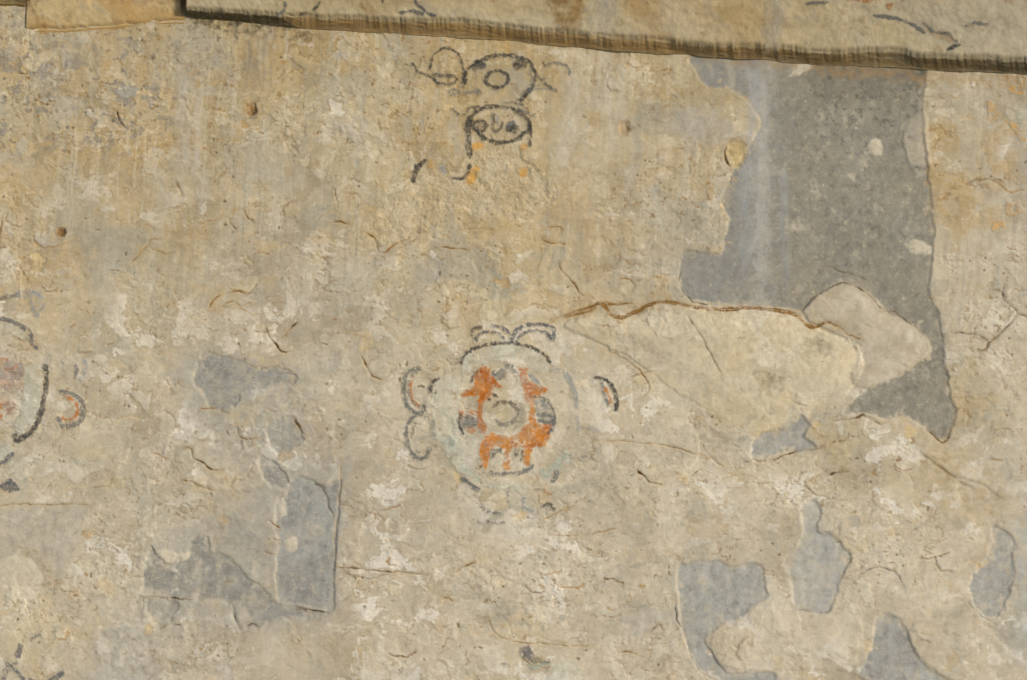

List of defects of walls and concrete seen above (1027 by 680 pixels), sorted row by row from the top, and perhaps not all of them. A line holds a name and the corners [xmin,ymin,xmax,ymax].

peeling [186,347,299,409]
crack [534,221,1027,402]
peeling [675,55,958,440]
peeling [138,414,344,641]
peeling [669,493,853,680]
peeling [852,611,952,680]
peeling [967,520,1016,620]